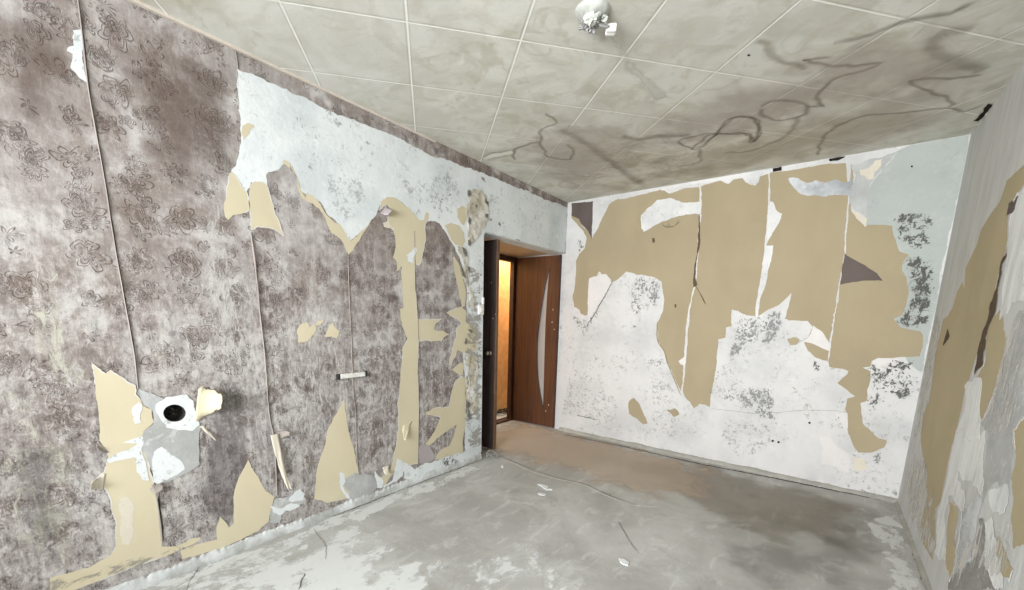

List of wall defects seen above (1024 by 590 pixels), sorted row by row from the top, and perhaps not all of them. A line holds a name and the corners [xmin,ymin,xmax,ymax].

flaking render [67,30,86,82]
peeling [107,389,201,485]
flaking render [231,69,567,488]
flaking render [641,198,701,243]
water stain [712,311,782,419]
flaking render [756,201,782,317]
peeling [773,151,897,218]
water stain [867,213,939,436]
peeling [935,187,1024,590]
flaking render [118,497,135,545]